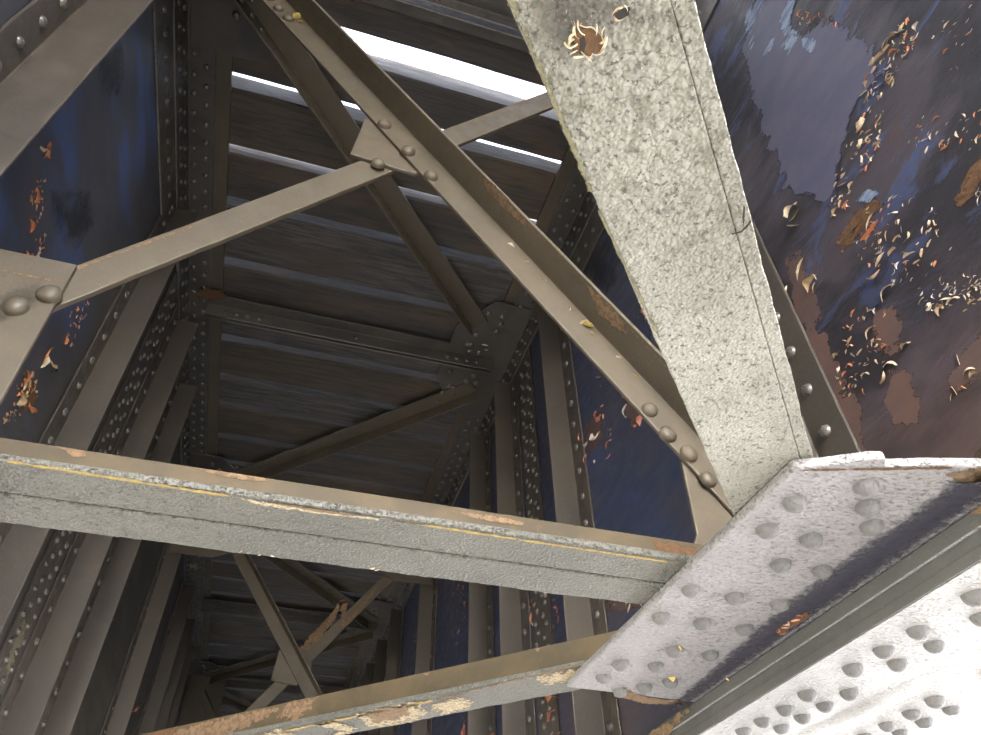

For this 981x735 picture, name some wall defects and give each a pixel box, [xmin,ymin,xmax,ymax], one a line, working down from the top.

peeling [540,10,608,62]
peeling [612,5,630,21]
peeling [741,0,918,226]
peeling [908,109,981,153]
peeling [65,300,89,346]
peeling [785,195,981,452]
peeling [3,347,58,424]
peeling [622,397,642,428]
corrosion [804,448,981,484]
peeling [317,697,473,735]
peeling [530,668,579,734]
corrosion [614,688,691,735]